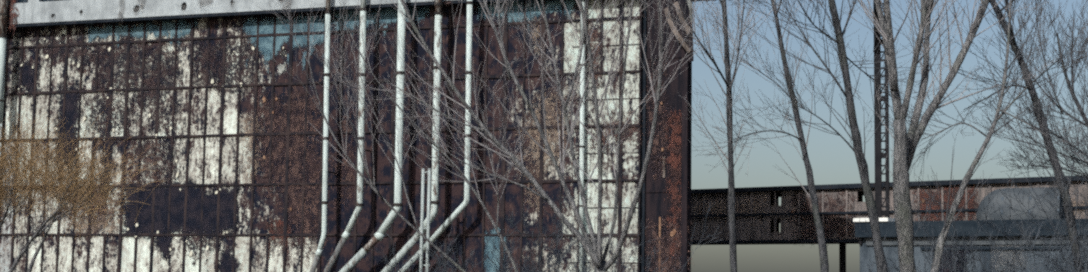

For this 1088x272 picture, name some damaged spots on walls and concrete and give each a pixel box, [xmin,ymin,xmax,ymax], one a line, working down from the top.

damp [88,18,197,46]
rust [239,86,356,263]
rust [584,57,767,272]